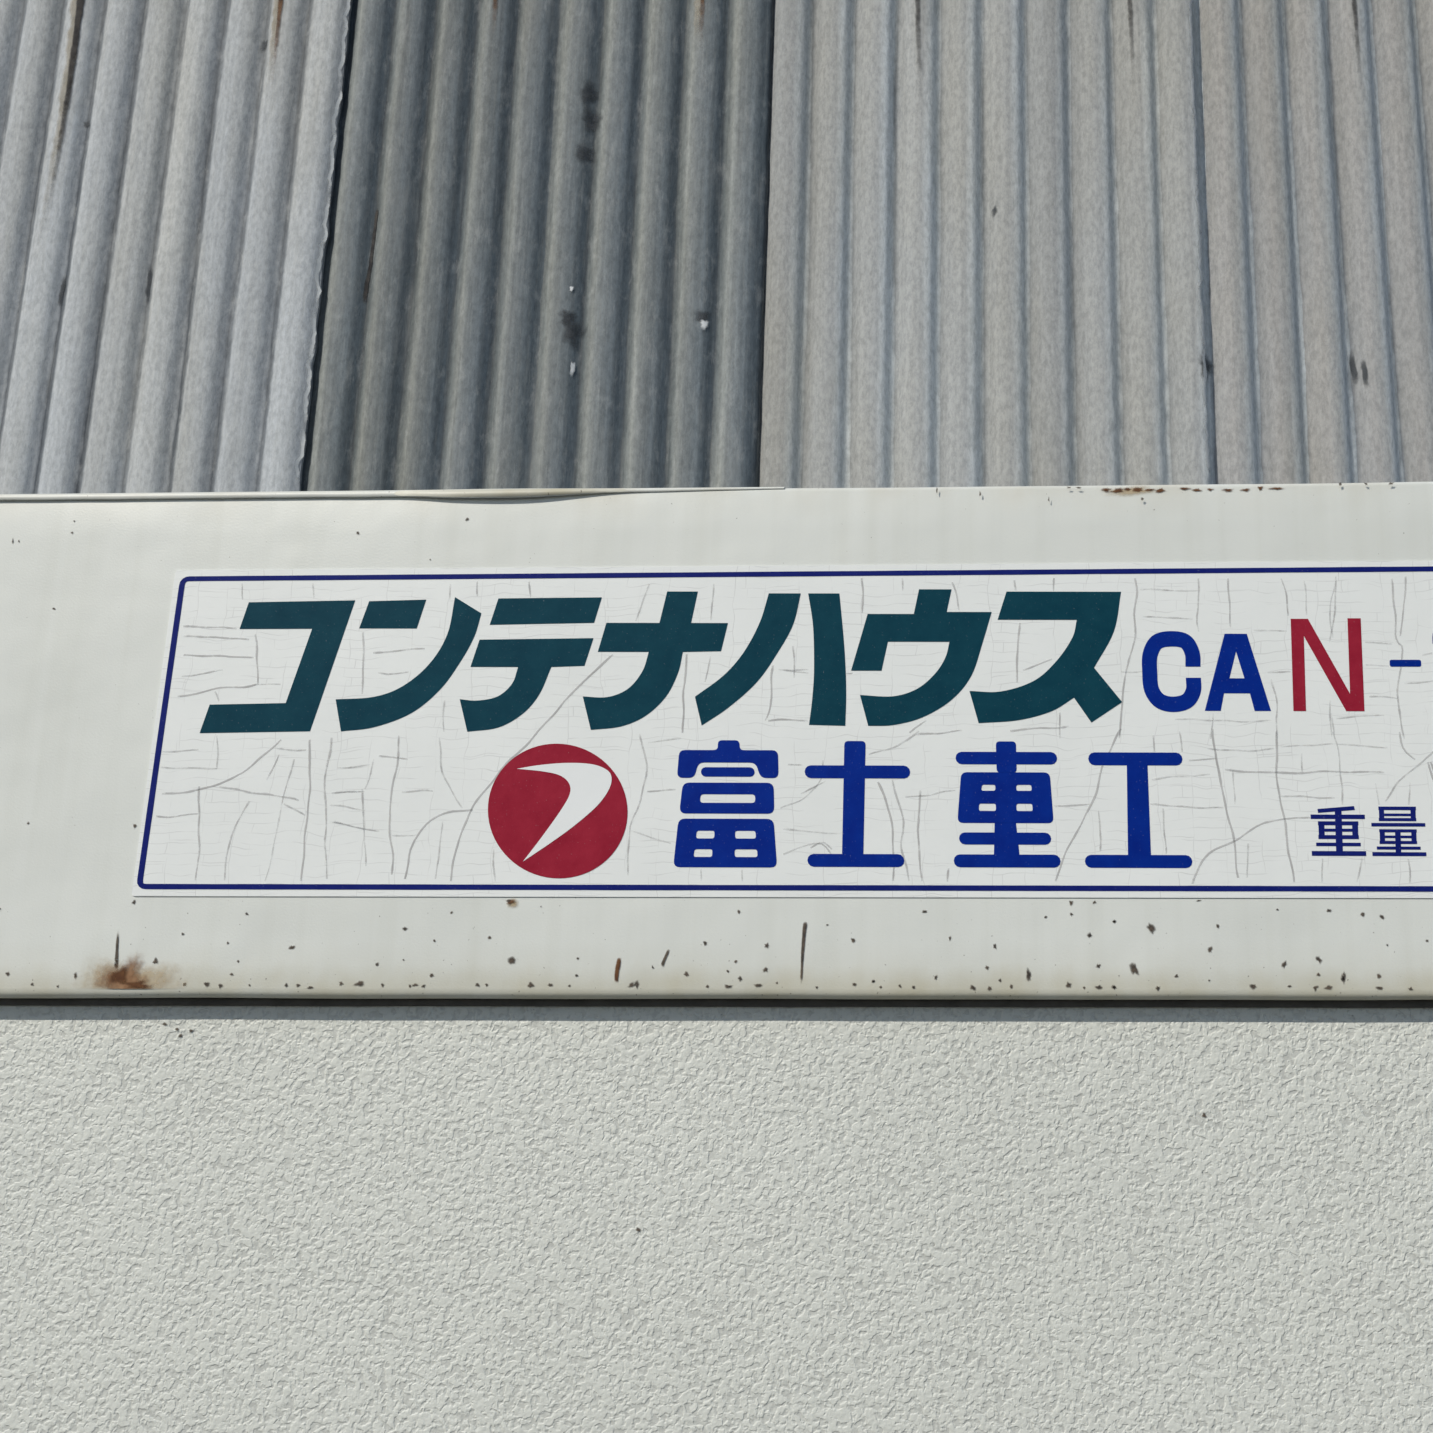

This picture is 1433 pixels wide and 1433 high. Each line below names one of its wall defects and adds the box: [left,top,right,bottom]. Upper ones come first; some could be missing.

corrosion [58,0,84,148]
corrosion [97,935,162,989]